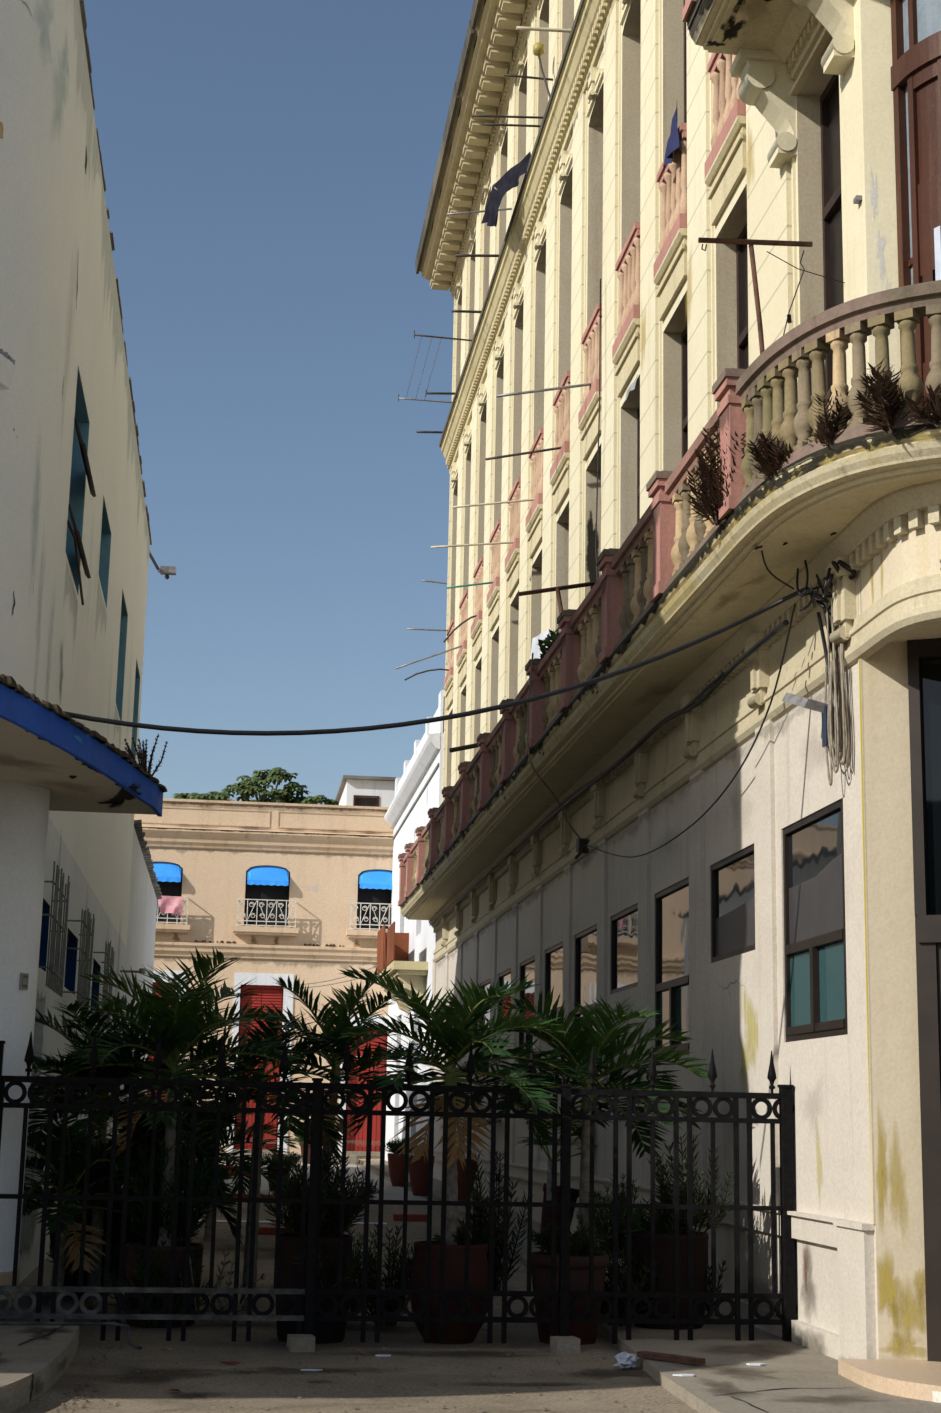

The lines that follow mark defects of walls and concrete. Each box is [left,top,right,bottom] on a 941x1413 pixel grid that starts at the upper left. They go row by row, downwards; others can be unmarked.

leakage [744,1001,758,1045]
leakage [877,1134,902,1210]
leakage [879,1263,925,1354]